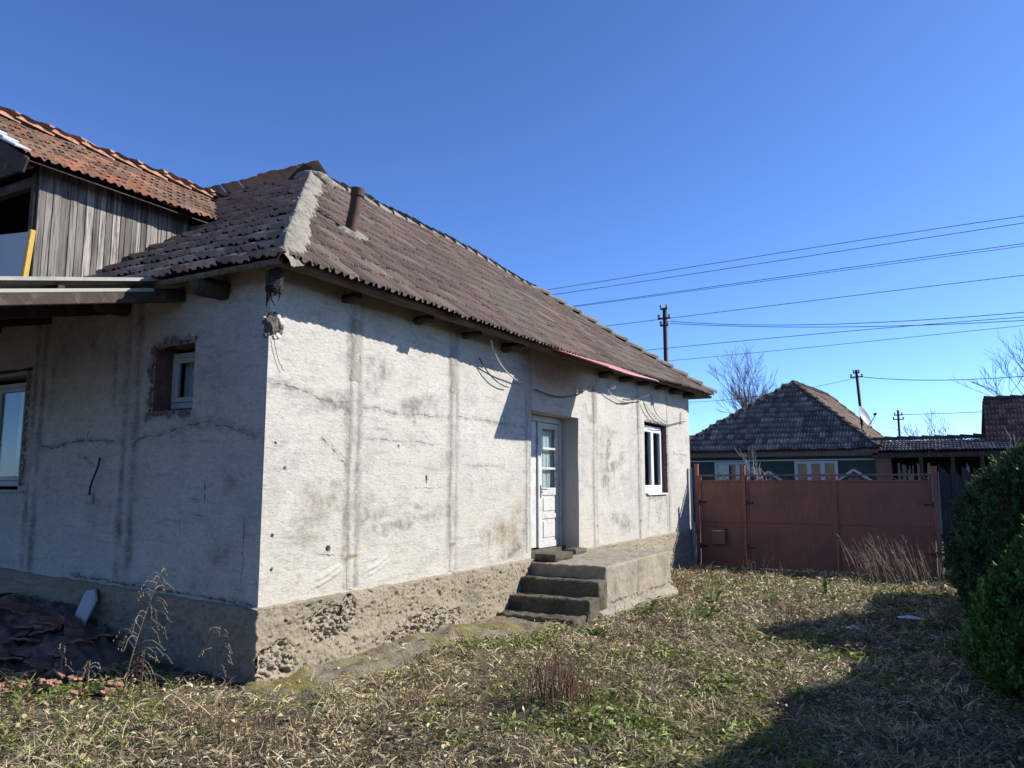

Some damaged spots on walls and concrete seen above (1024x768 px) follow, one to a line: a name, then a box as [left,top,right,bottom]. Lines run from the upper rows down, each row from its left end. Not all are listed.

crack [40,421,258,464]
spalling [303,595,357,647]
spalling [251,639,298,681]